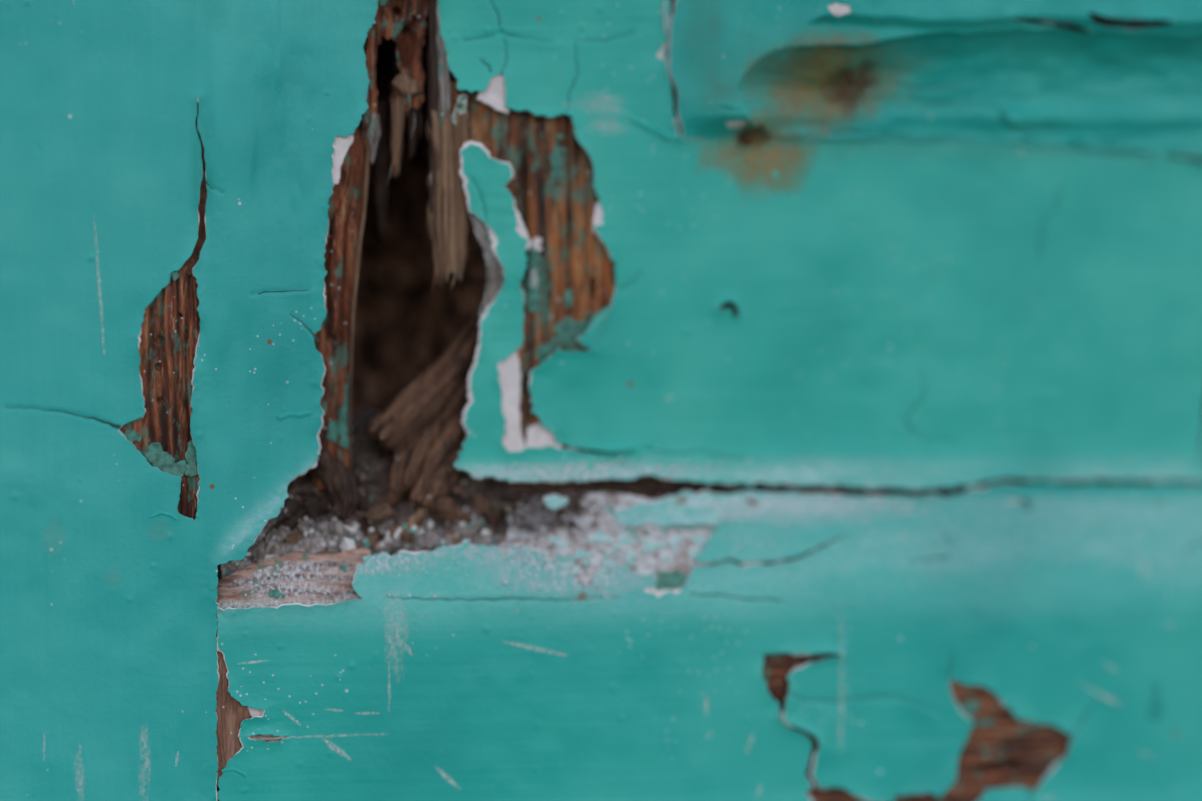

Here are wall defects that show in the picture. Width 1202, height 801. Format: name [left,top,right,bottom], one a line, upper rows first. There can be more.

peeling [451,95,468,125]
crack [663,0,681,136]
peeling [576,306,613,349]
peeling [120,258,200,519]
peeling [499,491,721,596]
peeling [216,651,289,787]
peeling [762,653,839,709]
peeling [806,779,864,801]
peeling [895,681,1071,801]